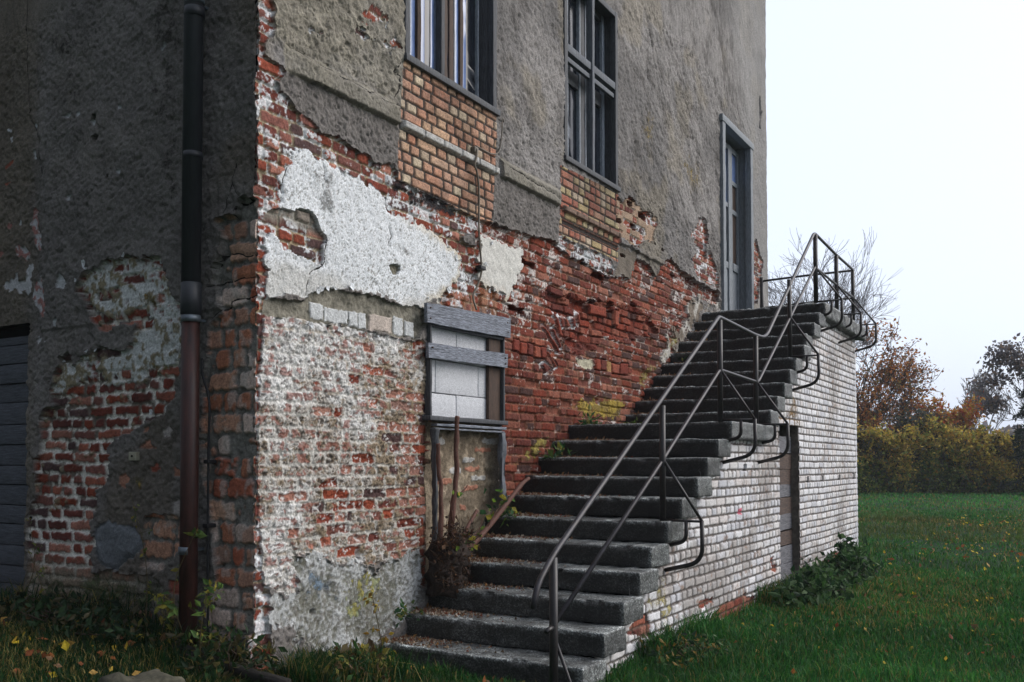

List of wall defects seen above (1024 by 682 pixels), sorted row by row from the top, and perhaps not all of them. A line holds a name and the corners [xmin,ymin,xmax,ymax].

flaking render [0,207,181,615]
peeling [199,0,722,671]